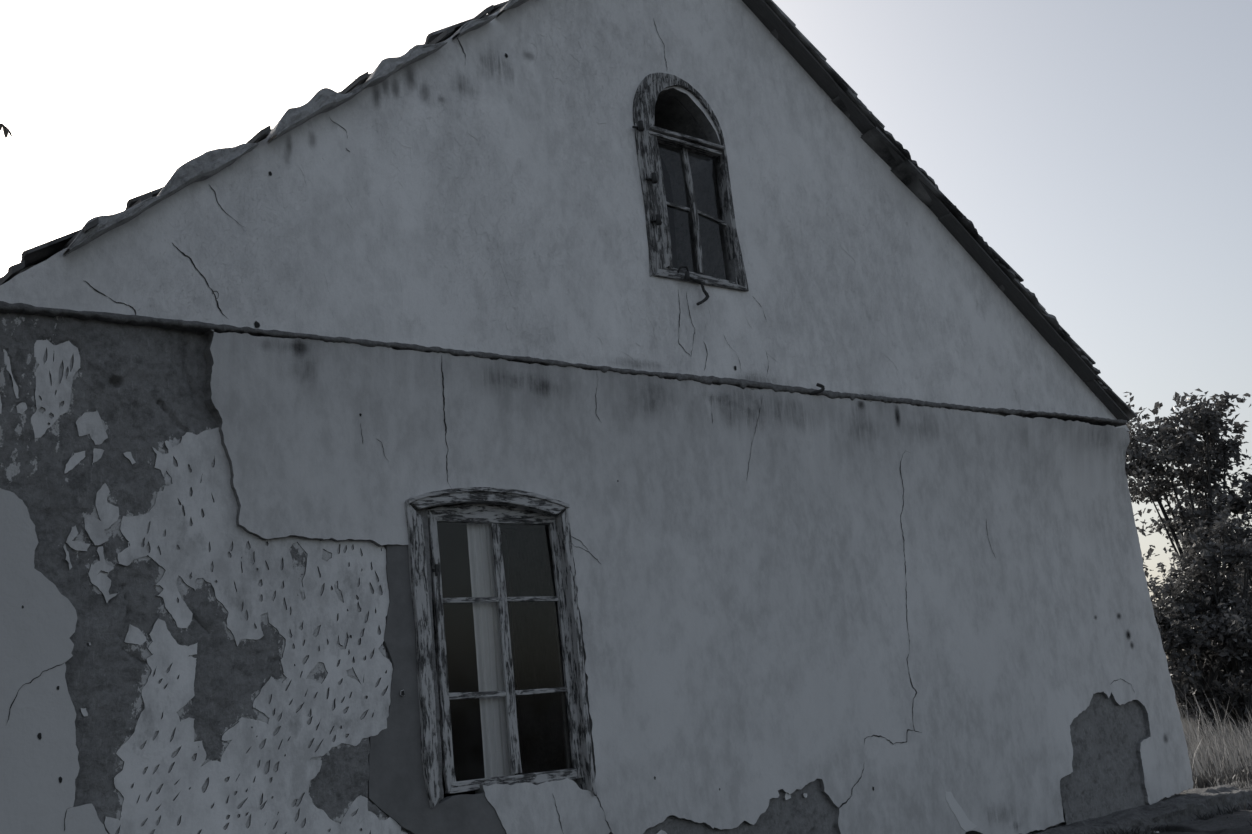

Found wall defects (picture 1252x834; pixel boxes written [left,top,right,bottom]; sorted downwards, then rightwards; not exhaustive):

crack [441,355,452,489]
flaking render [0,312,506,834]
crack [839,452,921,808]
flaking render [643,779,838,834]
flaking render [1060,693,1146,825]